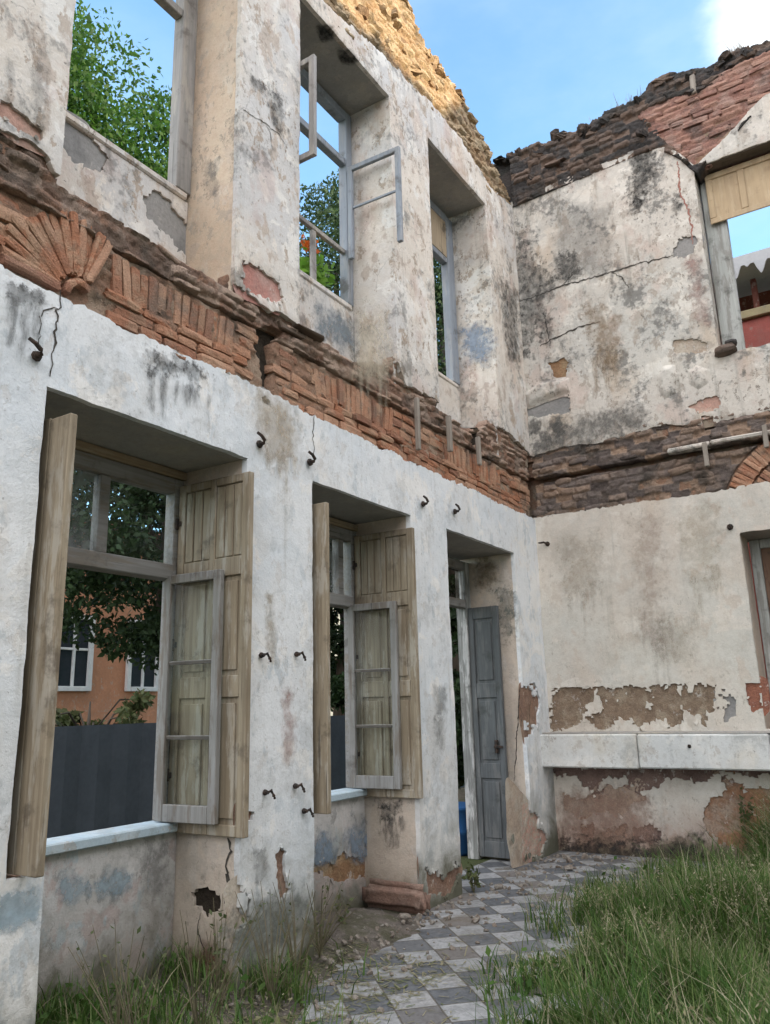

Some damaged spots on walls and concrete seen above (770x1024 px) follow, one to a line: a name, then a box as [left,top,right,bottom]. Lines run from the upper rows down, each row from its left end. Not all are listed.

flaking render [63,110,107,172]
flaking render [143,190,186,254]
peeling [233,255,283,315]
crack [519,161,693,346]
crack [38,290,62,376]
leakage [149,350,206,400]
flaking render [518,676,770,745]
flaking render [505,778,546,868]
flaking render [553,767,770,855]
crack [224,838,233,904]
flaking render [275,844,288,897]
peeling [194,875,252,943]